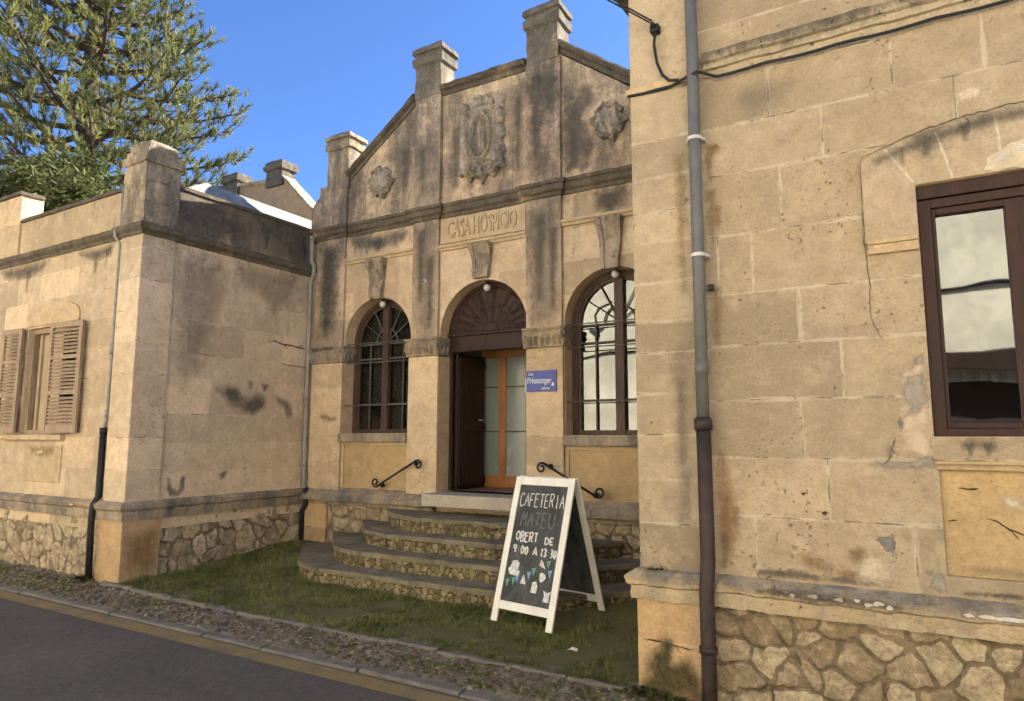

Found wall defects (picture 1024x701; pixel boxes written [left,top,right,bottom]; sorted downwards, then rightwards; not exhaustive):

damp [516,67,555,175]
crack [859,101,1024,335]
damp [321,245,337,337]
damp [226,387,267,412]
crack [268,340,306,367]
peeling [888,354,932,457]
crack [985,517,1024,540]
spalling [962,613,1024,623]